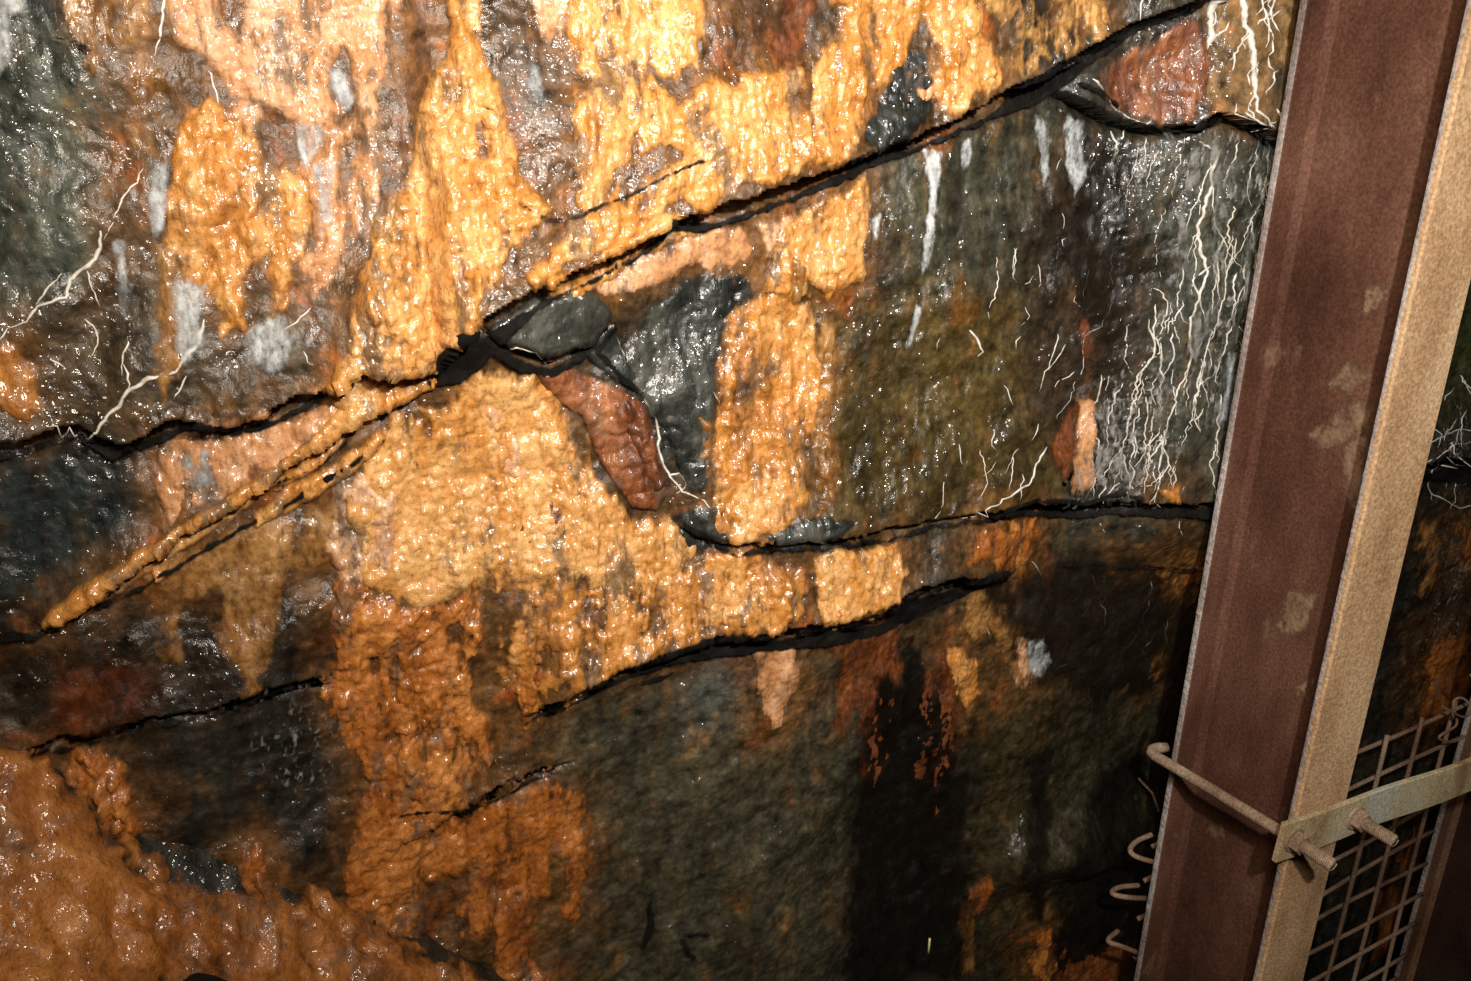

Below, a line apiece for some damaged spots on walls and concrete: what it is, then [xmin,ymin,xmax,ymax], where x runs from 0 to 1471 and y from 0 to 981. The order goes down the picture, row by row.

crack [427,0,1277,393]
water stain [923,149,940,259]
water stain [1035,120,1048,180]
water stain [1064,117,1145,346]
crack [0,392,328,461]
corrosion [550,503,561,524]
crack [684,490,1214,557]
crack [525,570,1012,725]
corrosion [832,617,904,787]
corrosion [914,637,965,787]
corrosion [455,768,590,969]
water stain [842,635,994,981]